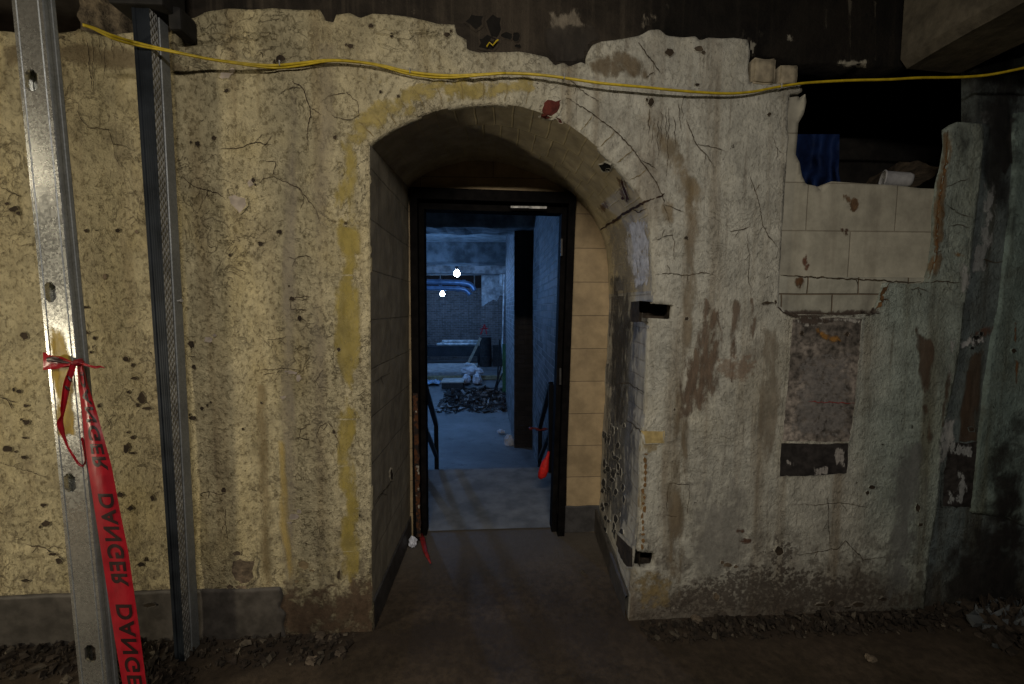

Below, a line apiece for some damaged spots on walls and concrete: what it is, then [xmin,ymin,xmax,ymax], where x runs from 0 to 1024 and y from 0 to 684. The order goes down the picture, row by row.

spalling [464,13,522,52]
crack [275,69,359,144]
crack [568,81,714,280]
spalling [748,58,961,189]
corrosion [928,133,952,271]
water stain [334,220,360,385]
water stain [677,179,756,457]
peeling [780,315,863,444]
water stain [280,408,373,635]
peeling [600,423,626,540]